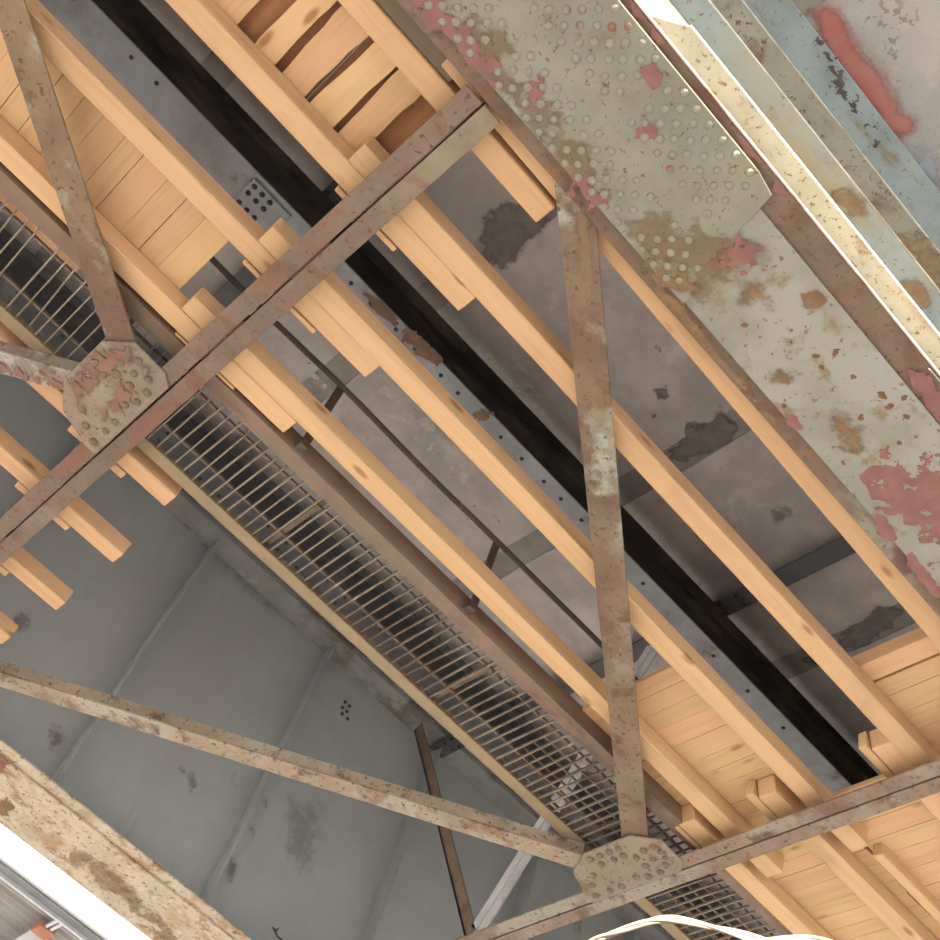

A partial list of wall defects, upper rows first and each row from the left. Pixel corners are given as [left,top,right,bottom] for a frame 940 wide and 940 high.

peeling [405,0,502,86]
peeling [513,73,551,107]
rust [831,189,867,216]
water stain [480,203,557,270]
rust [897,233,940,309]
water stain [654,389,668,400]
peeling [907,367,940,422]
water stain [670,413,737,462]
peeling [859,445,940,599]
water stain [838,606,902,649]